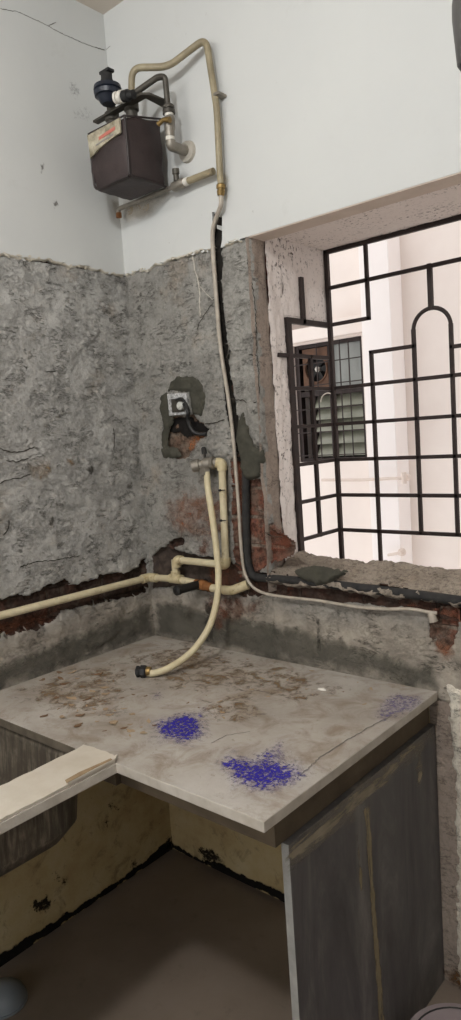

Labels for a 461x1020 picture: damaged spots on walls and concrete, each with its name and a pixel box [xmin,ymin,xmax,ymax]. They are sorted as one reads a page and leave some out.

crack [0,8,110,50]
flaking render [168,414,209,459]
flaking render [0,454,461,656]
crack [300,715,392,775]
leakage [0,837,285,967]